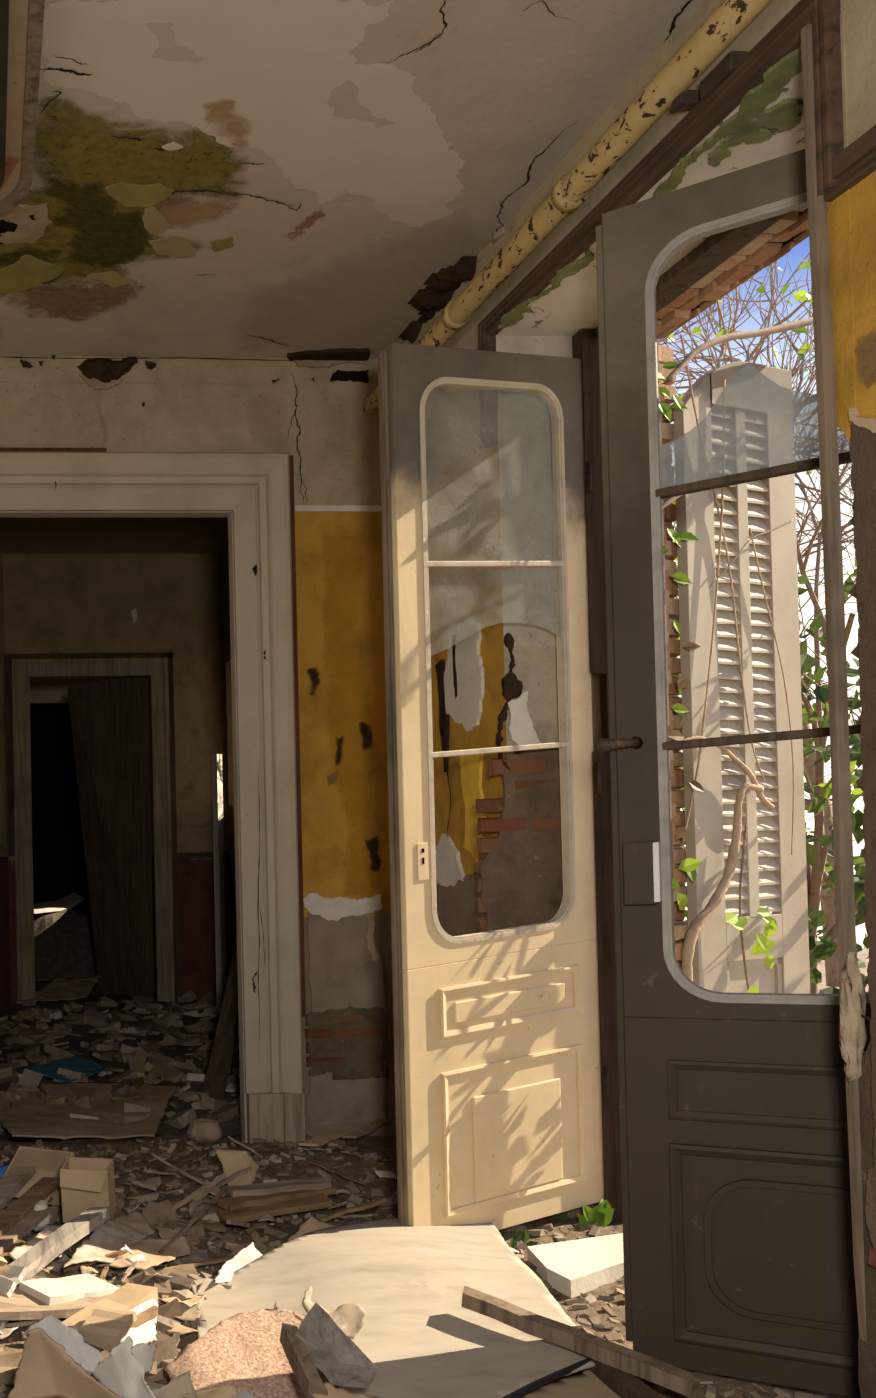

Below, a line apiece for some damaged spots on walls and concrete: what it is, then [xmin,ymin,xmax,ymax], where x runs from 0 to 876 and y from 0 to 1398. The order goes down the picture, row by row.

crack [381,0,448,63]
peeling [41,0,465,227]
peeling [0,202,64,295]
peeling [86,271,137,288]
leakage [0,97,246,321]
peeling [105,182,234,259]
spalling [398,226,505,344]
crack [496,122,577,231]
spalling [77,357,156,390]
crack [6,334,307,505]
peeling [303,892,390,1129]